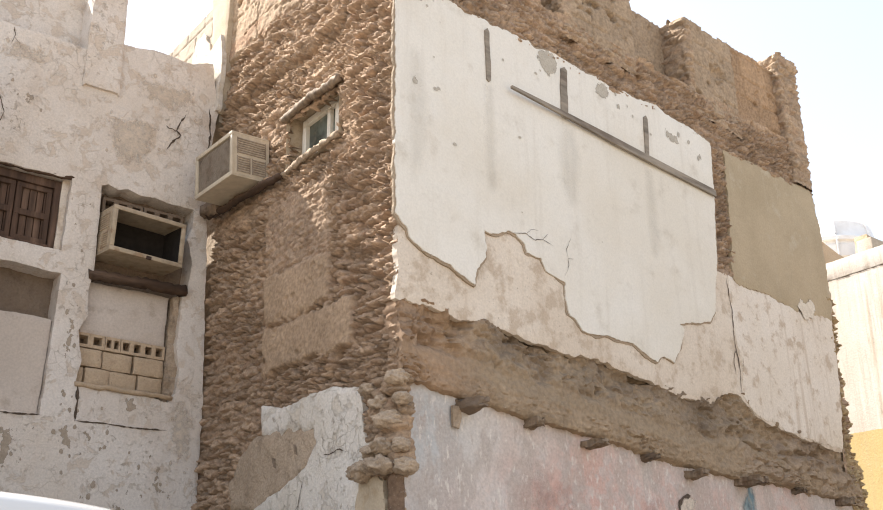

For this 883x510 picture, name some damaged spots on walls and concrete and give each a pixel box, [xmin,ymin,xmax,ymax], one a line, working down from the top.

crack [166,115,186,149]
crack [205,110,213,149]
flaking render [390,0,843,453]
crack [726,280,742,389]
flaking render [254,386,370,510]